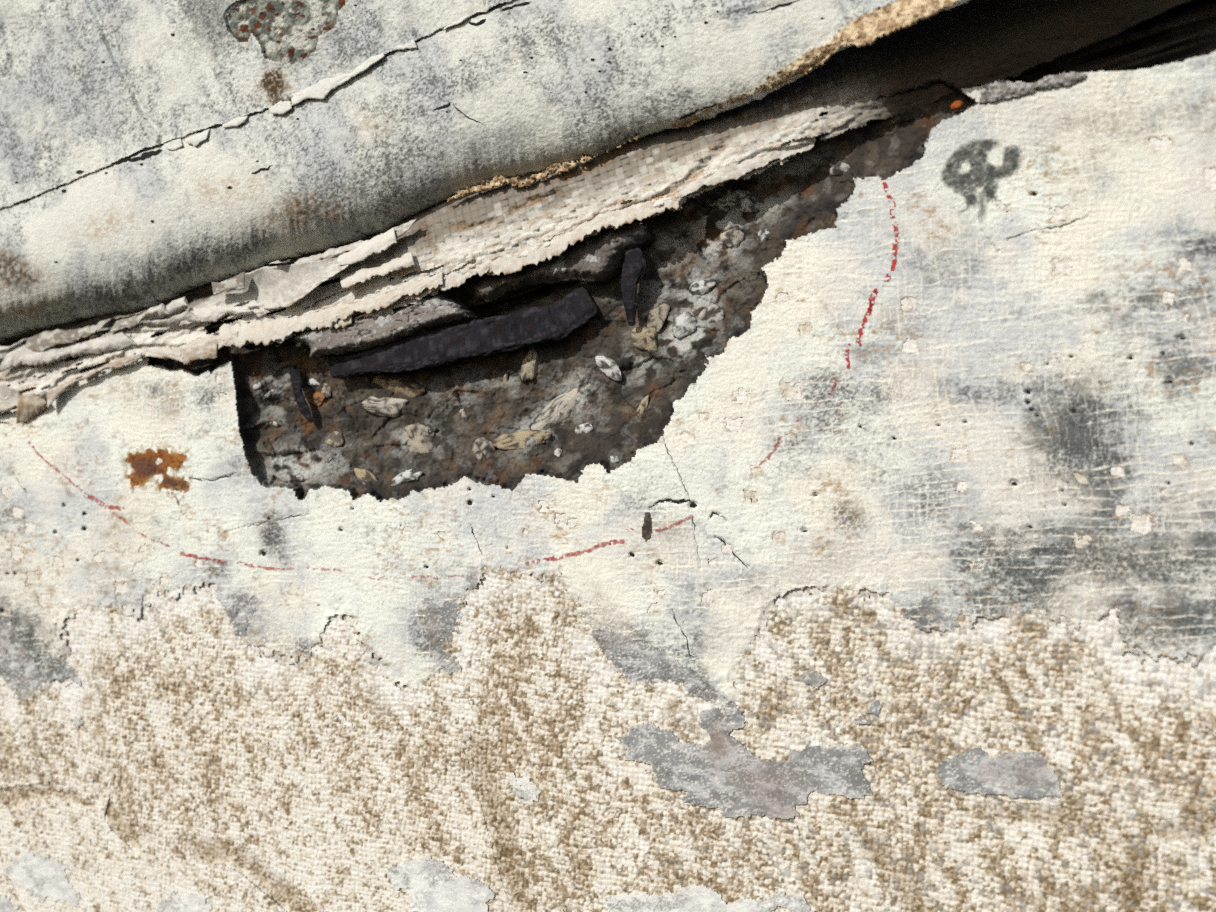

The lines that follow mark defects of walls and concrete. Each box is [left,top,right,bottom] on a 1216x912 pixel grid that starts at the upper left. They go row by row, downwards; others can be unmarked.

crack [2,2,529,209]
spalling [148,72,1087,510]
corrosion [124,448,189,505]
crack [649,441,749,569]
peeling [0,566,1216,912]